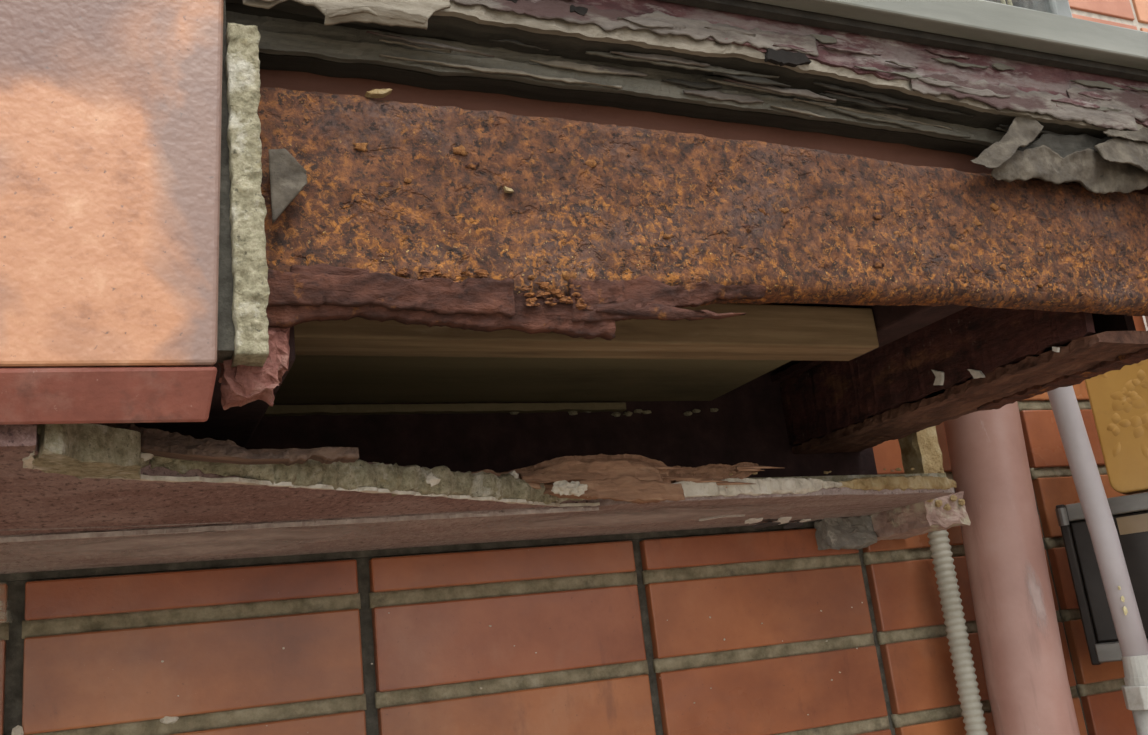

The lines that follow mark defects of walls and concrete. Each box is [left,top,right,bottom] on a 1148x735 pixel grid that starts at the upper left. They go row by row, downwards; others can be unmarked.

peeling [243,0,1148,194]
spalling [216,0,307,410]
corrosion [266,263,767,341]
peeling [977,348,1148,410]
spalling [0,423,971,550]